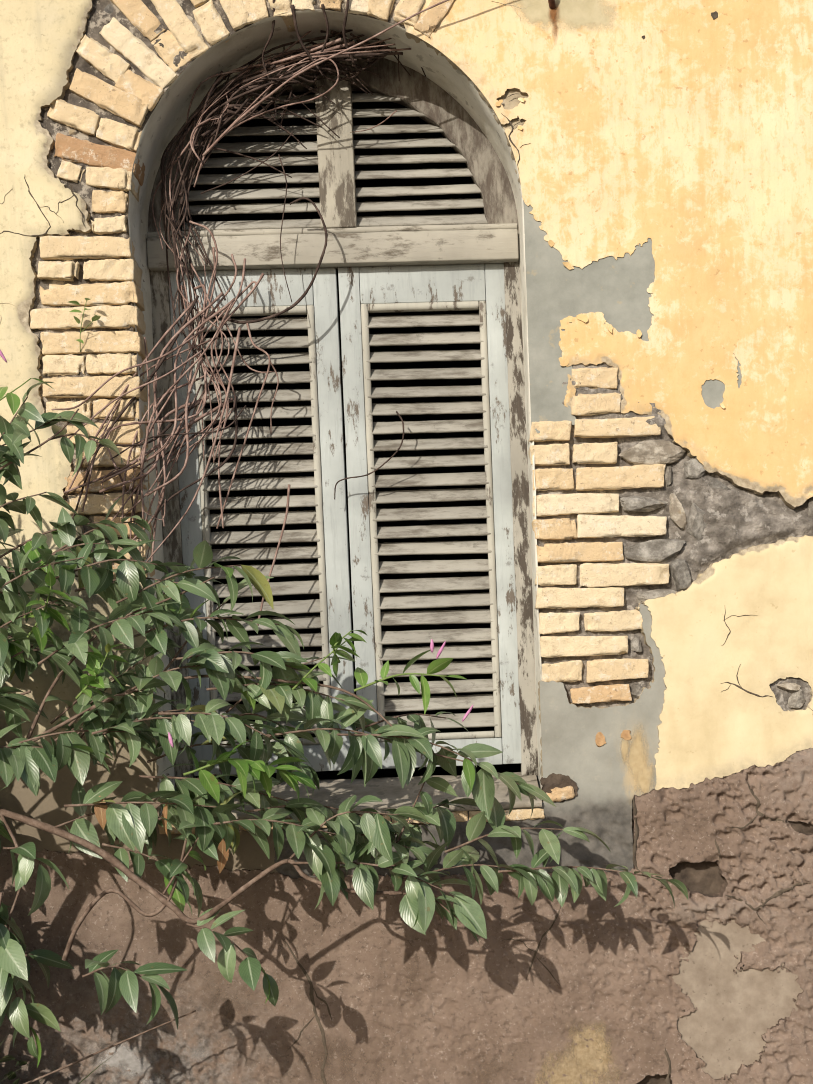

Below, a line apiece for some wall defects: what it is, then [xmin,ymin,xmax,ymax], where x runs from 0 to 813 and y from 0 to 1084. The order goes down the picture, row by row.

peeling [495,90,528,130]
crack [0,177,86,237]
spalling [29,0,455,582]
spalling [523,200,813,711]
crack [721,611,772,697]
spalling [595,732,606,747]
spalling [540,773,578,802]
spalling [672,917,803,1079]